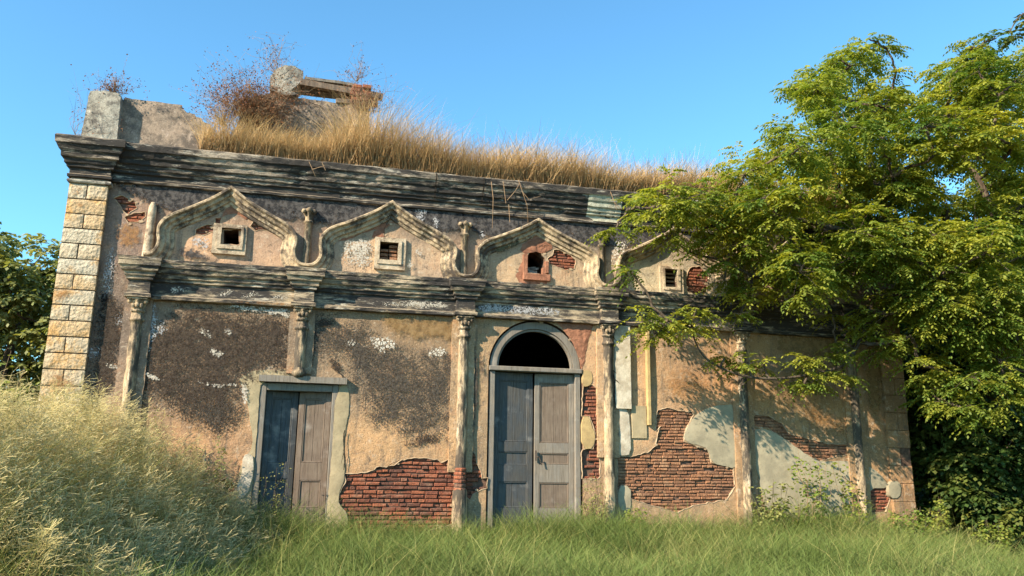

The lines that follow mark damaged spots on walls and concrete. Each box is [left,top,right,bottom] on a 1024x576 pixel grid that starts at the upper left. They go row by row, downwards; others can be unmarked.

spalling [114,195,146,225]
spalling [515,236,576,285]
water stain [141,287,290,439]
water stain [312,300,453,448]
spalling [339,451,488,535]
spalling [581,384,601,480]
spalling [617,407,736,513]
spalling [754,414,848,461]